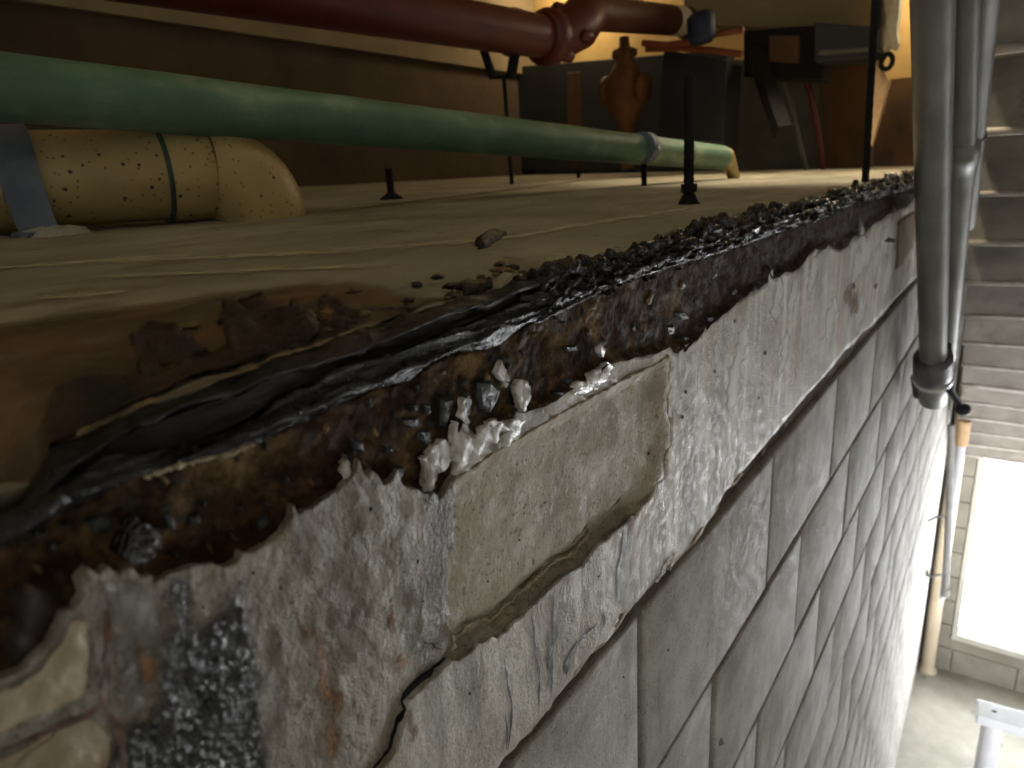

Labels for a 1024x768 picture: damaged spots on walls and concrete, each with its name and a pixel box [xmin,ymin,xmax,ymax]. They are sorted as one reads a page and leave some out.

spalling [0,188,916,672]
crack [345,641,446,768]
crack [504,660,513,750]
crack [531,595,606,711]